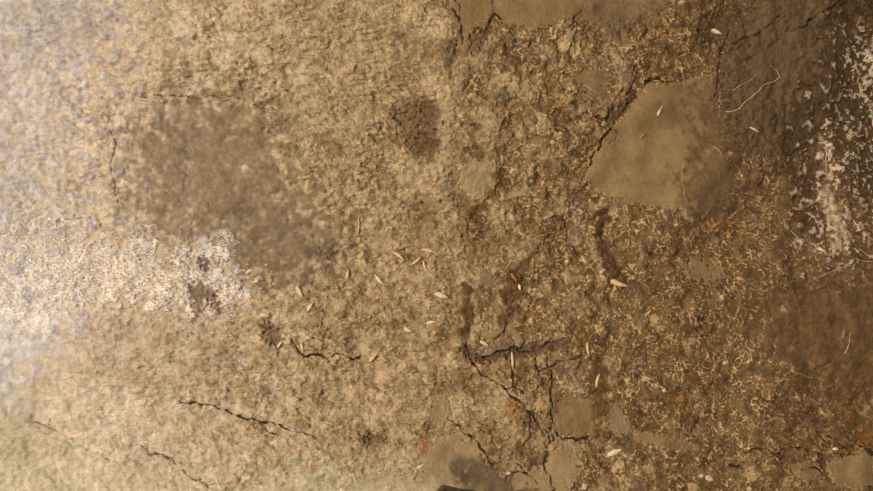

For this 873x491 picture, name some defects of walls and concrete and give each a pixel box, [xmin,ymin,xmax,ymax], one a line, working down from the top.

spalling [469,28,489,56]
spalling [596,90,635,130]
water stain [769,0,873,251]
water stain [0,91,333,413]
crack [10,419,231,491]
crack [175,398,321,443]
crack [451,342,598,491]